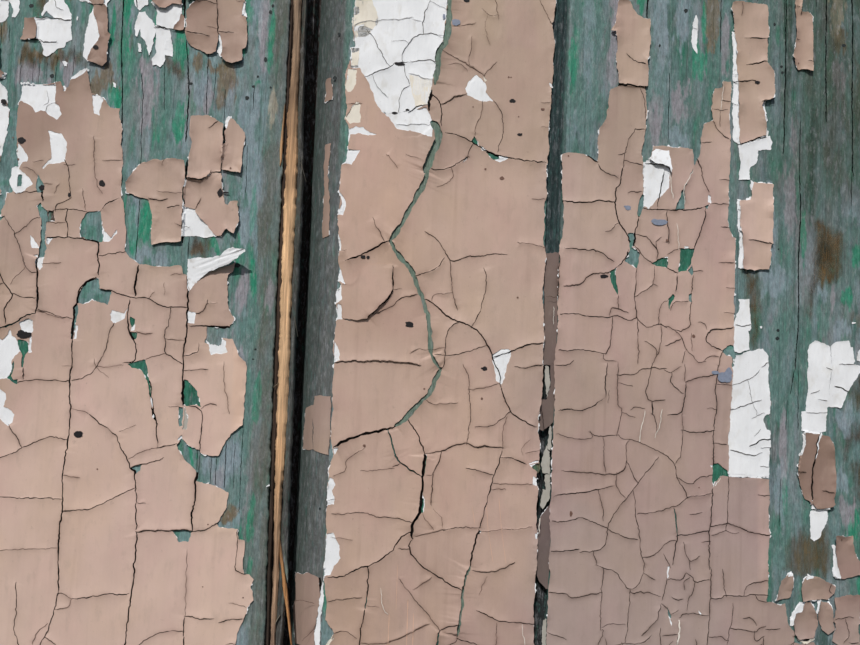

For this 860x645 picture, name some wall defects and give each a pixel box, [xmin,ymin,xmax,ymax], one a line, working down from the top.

peeling [0,318,33,384]
peeling [0,0,111,270]
crack [0,138,245,645]
peeling [125,115,245,245]
peeling [134,0,248,67]
peeling [187,247,245,290]
peeling [345,0,448,137]
crack [328,0,806,645]
peeling [710,299,771,487]
peeling [731,1,775,271]
peeling [797,340,860,541]
peeling [775,536,860,644]